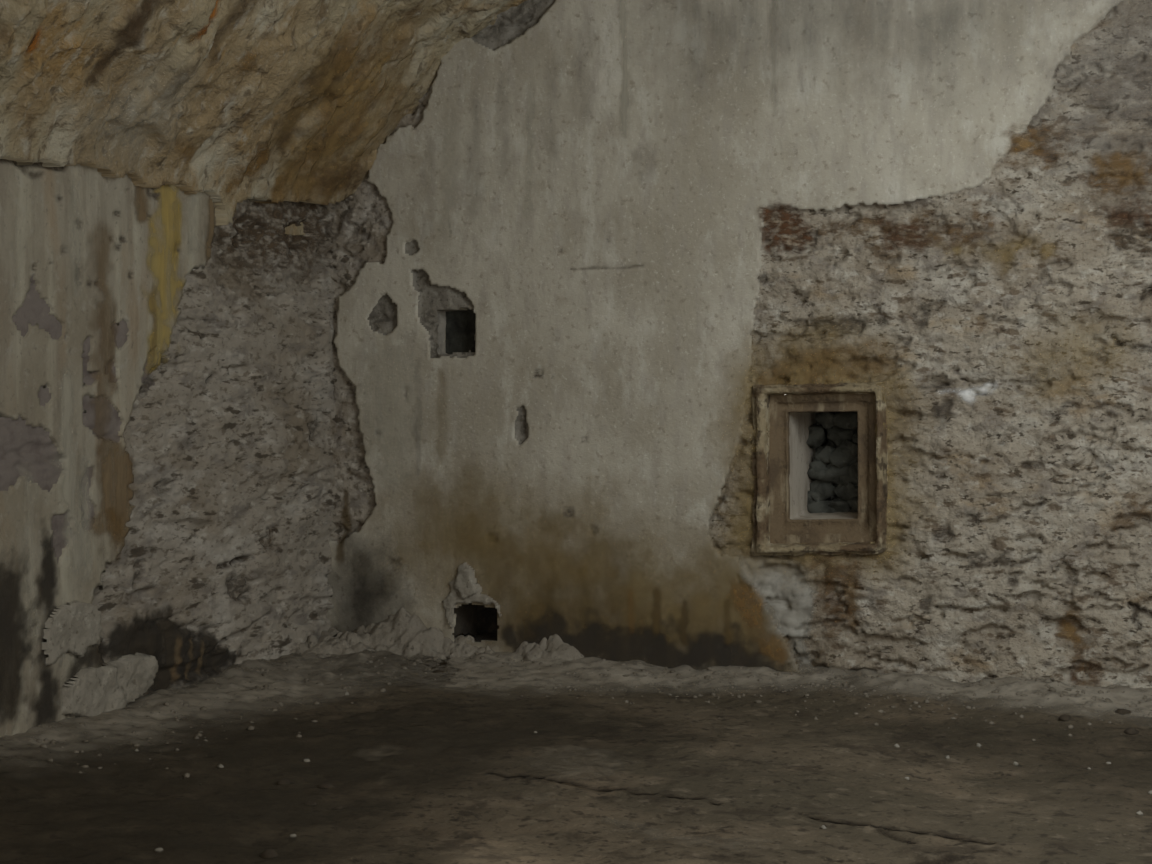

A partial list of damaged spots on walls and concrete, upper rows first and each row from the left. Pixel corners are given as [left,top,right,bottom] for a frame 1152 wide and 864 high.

flaking render [383,76,437,144]
flaking render [405,240,420,255]
flaking render [13,265,66,340]
flaking render [81,321,129,386]
flaking render [411,269,476,358]
flaking render [709,0,1152,689]
flaking render [0,415,64,492]
flaking render [92,176,397,689]
flaking render [51,511,72,564]
damp [345,555,389,628]
damp [453,516,792,672]